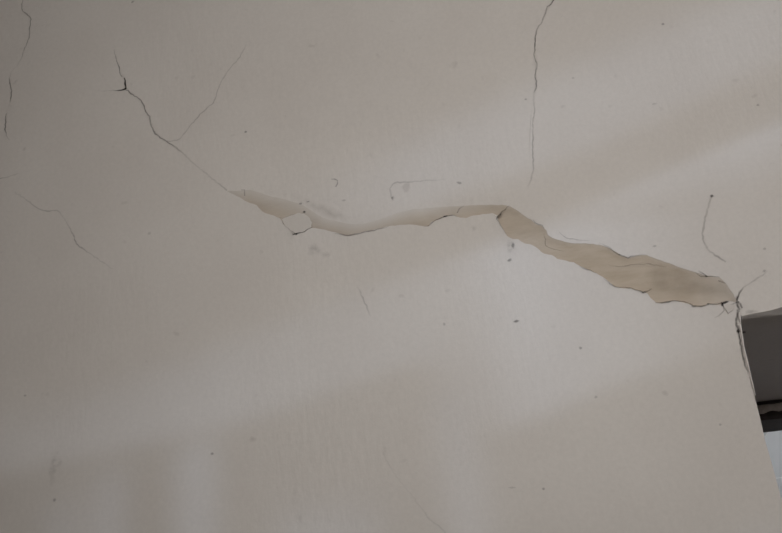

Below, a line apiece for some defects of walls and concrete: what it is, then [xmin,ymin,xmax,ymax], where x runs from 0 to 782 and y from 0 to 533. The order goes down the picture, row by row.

flaking render [228,190,756,396]